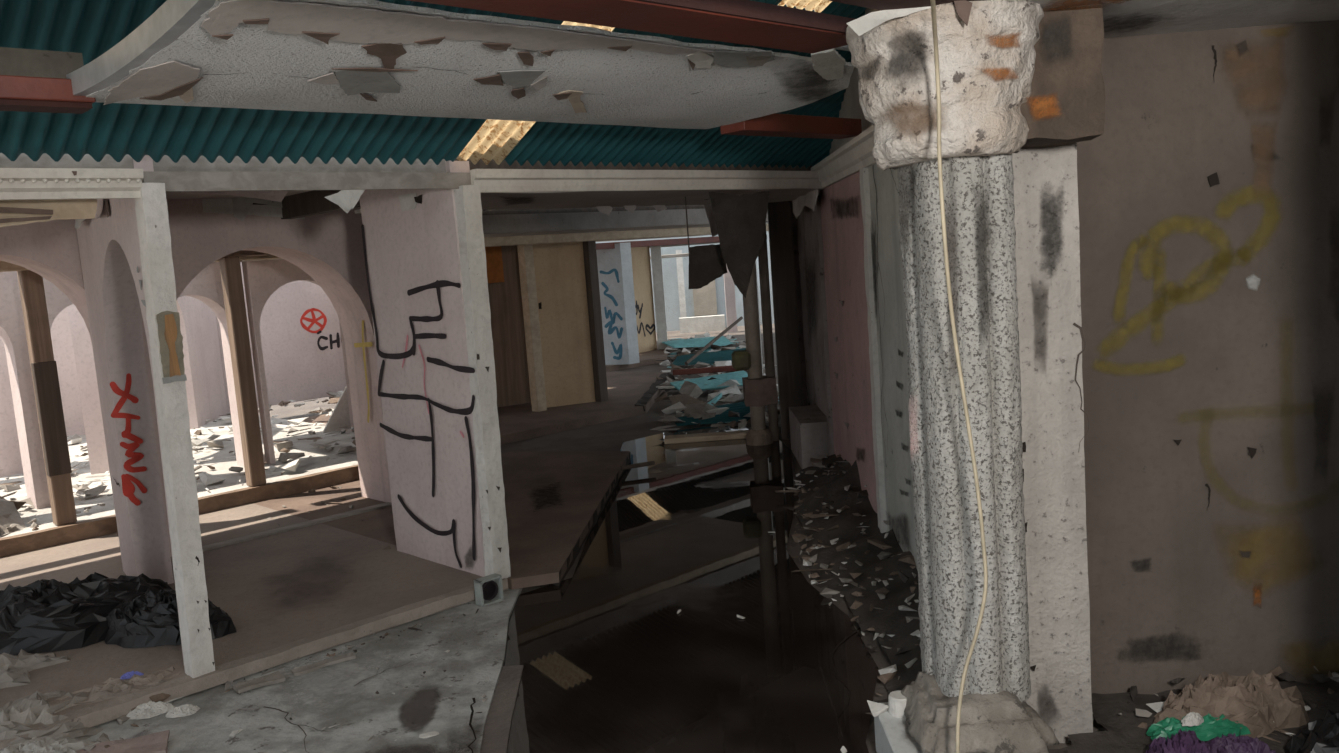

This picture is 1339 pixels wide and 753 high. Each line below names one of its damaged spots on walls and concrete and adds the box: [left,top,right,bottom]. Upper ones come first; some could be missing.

flaking render [846,6,931,36]
leakage [1103,15,1161,32]
flaking render [202,0,775,113]
flaking render [811,48,846,80]
leakage [860,32,925,80]
leakage [887,106,937,130]
leakage [1042,196,1062,273]
leakage [1034,292,1047,357]
leakage [378,688,480,753]